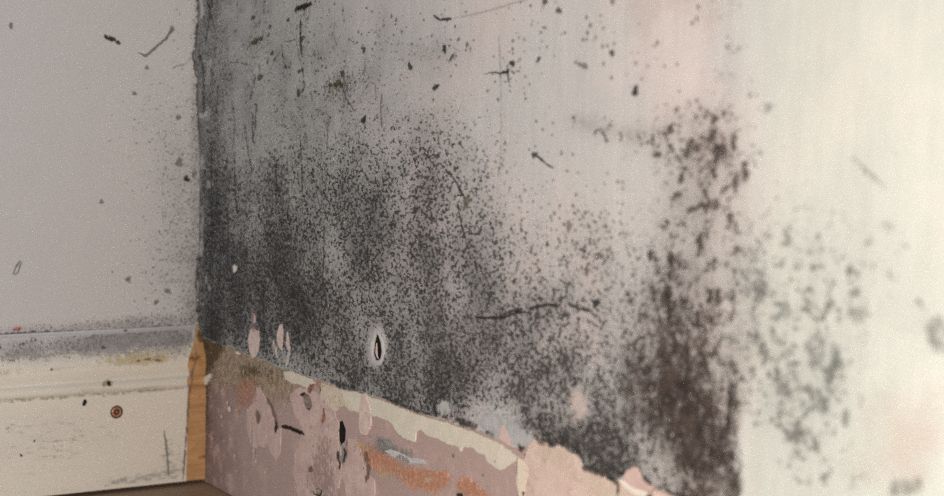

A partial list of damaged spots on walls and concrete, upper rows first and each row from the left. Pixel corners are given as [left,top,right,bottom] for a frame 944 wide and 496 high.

water stain [249,0,337,83]
water stain [388,29,463,74]
peeling [235,308,260,359]
peeling [273,324,291,369]
water stain [182,350,197,477]
peeling [300,382,353,413]
peeling [436,400,452,416]
peeling [479,413,533,447]
peeling [571,390,588,420]
peeling [374,437,427,464]
peeling [619,466,655,496]